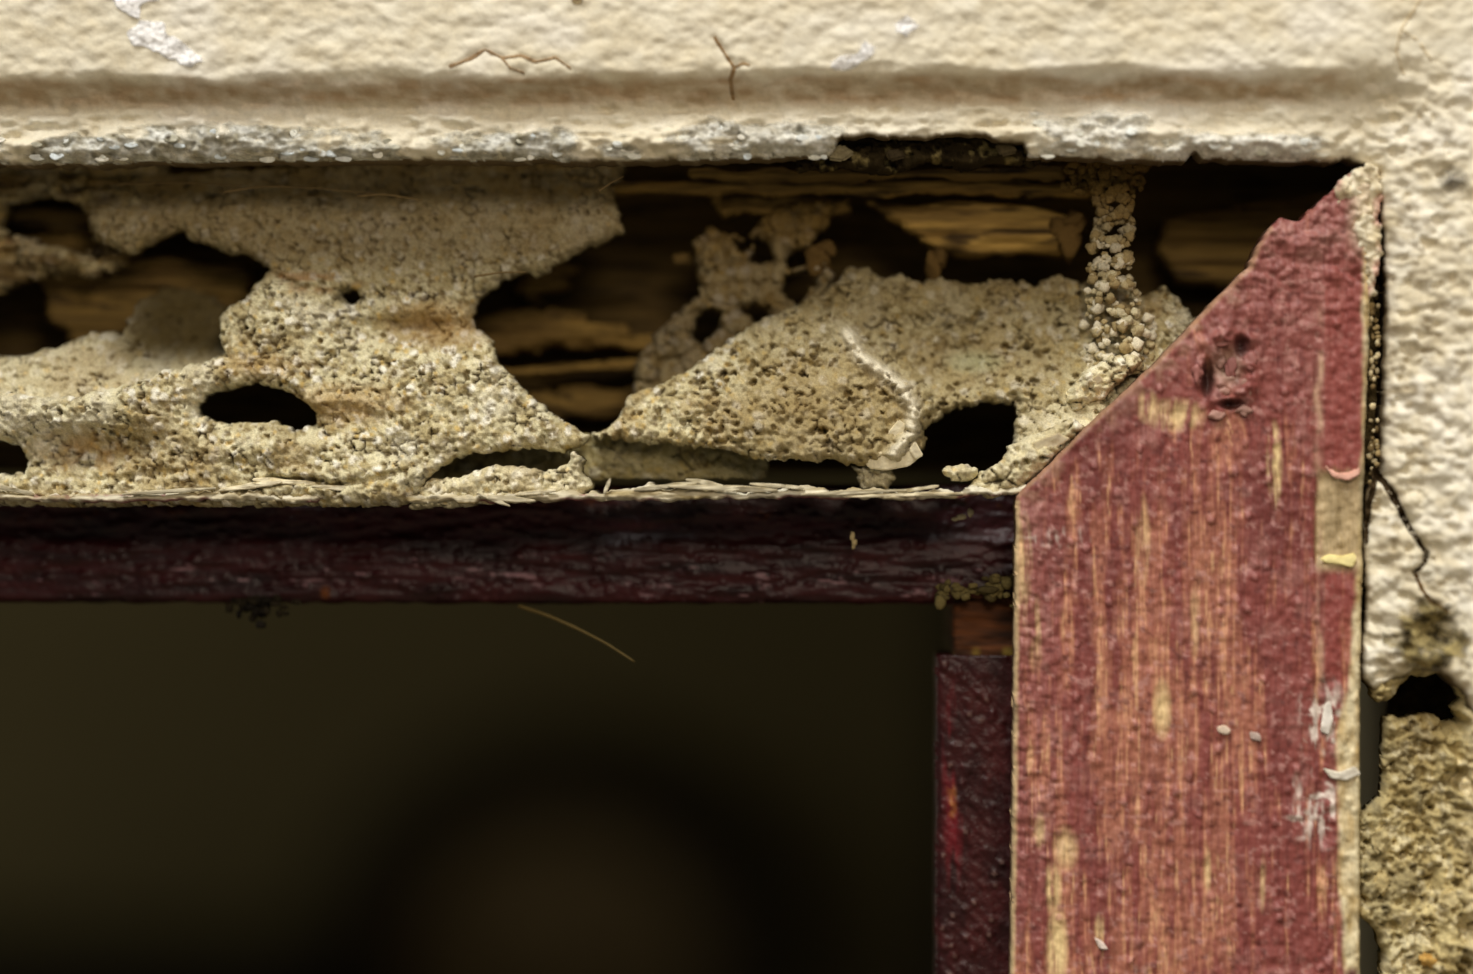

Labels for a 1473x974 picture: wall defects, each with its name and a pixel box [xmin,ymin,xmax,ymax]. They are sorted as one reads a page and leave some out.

peeling [437,132,574,162]
peeling [605,141,642,160]
crack [1364,276,1450,614]
peeling [1324,766,1360,780]
spalling [1359,670,1473,974]